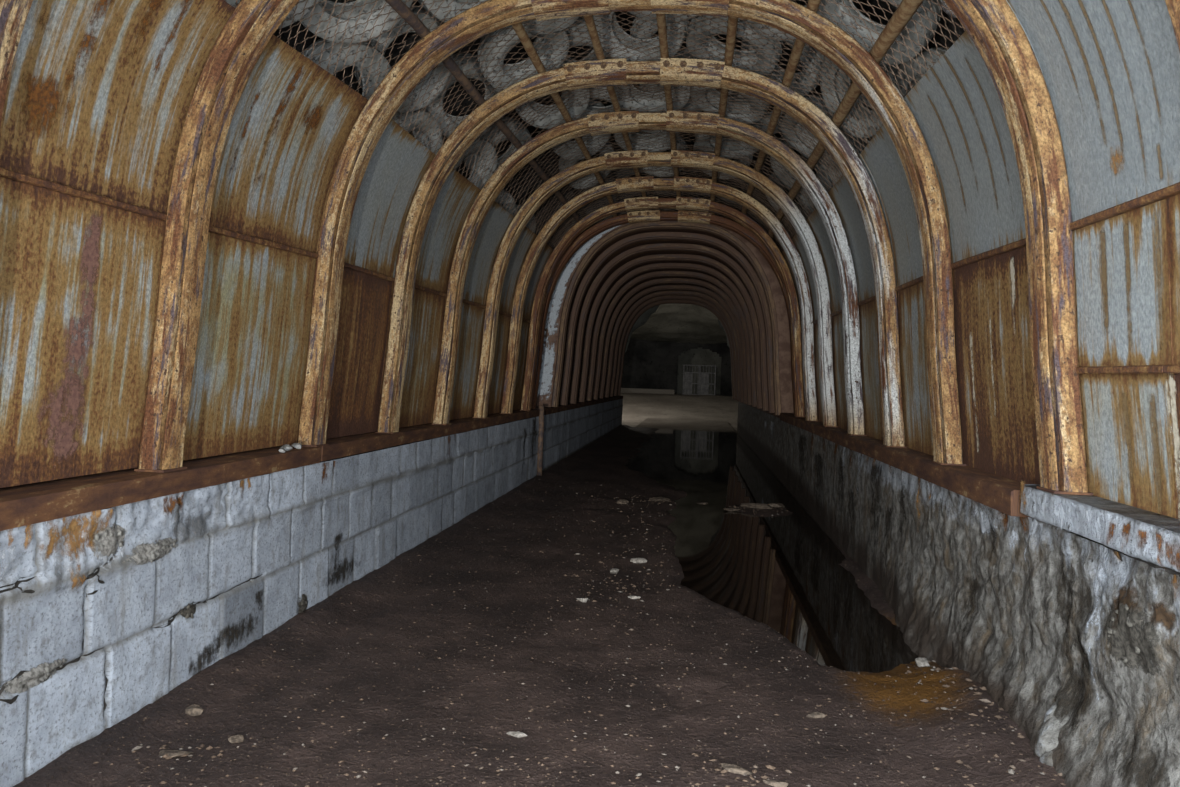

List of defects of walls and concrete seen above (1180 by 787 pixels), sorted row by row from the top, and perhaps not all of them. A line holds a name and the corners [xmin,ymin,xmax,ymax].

corrosion [22,0,113,137]
corrosion [267,66,304,151]
corrosion [1040,0,1123,175]
corrosion [38,214,103,459]
corrosion [1100,230,1108,329]
corrosion [1123,223,1132,346]
corrosion [1150,395,1161,511]
crack [0,555,118,711]
corrosion [8,509,113,589]
crack [154,574,263,628]
leakage [189,591,263,674]
corrosion [1107,523,1180,589]